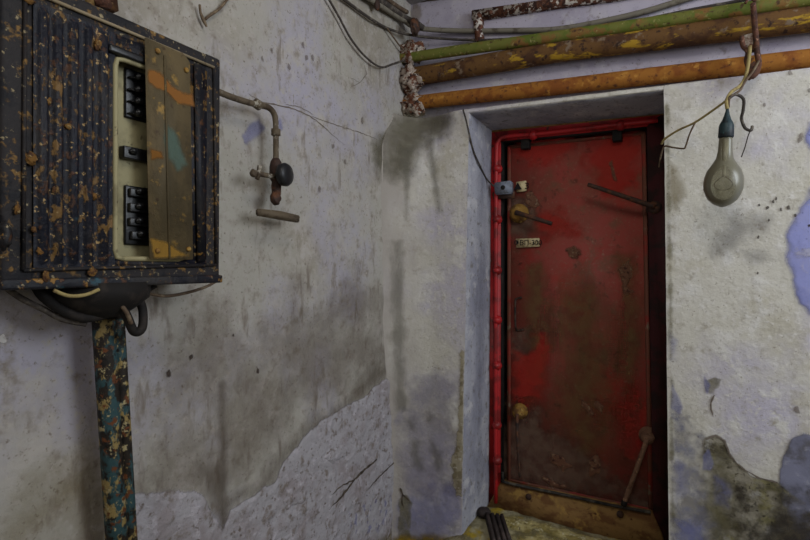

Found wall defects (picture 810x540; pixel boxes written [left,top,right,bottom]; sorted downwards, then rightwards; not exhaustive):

leakage [375,113,449,175]
peeling [758,197,810,312]
peeling [135,379,412,540]
crack [329,459,394,510]
peeling [672,413,810,540]
leakage [737,493,810,540]